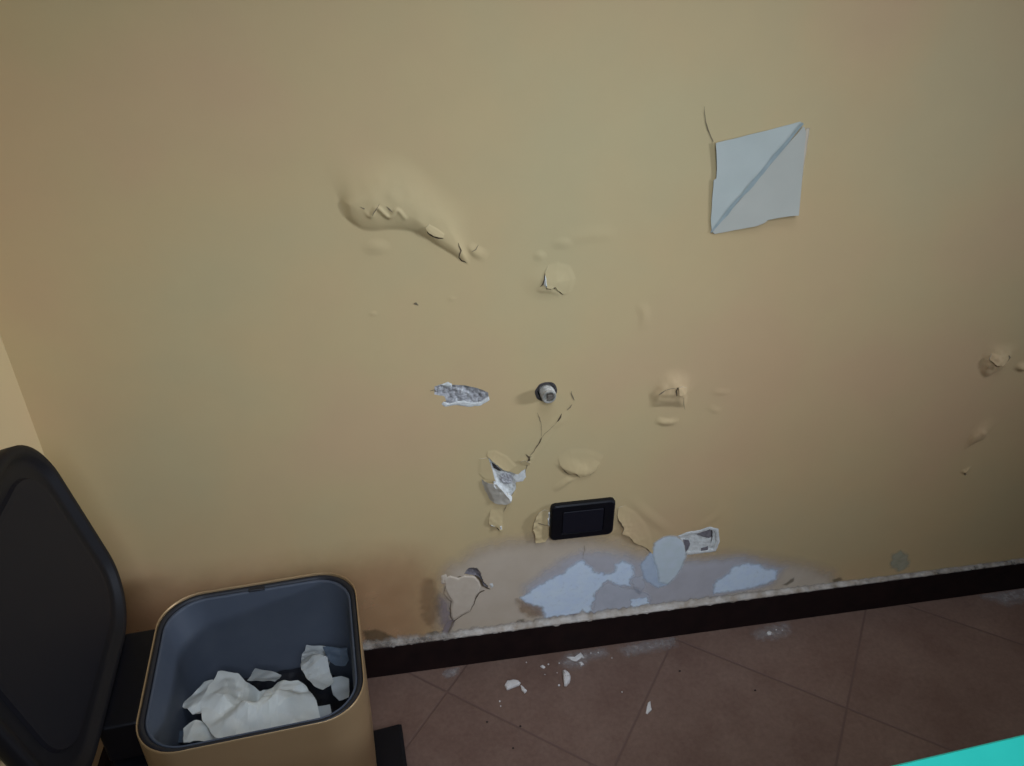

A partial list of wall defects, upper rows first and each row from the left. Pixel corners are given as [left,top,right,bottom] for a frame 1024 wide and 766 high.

spalling [431,382,490,407]
crack [516,391,574,472]
peeling [477,450,526,532]
peeling [533,510,550,543]
spalling [678,527,720,555]
leakage [442,539,832,634]
spalling [363,558,1024,650]